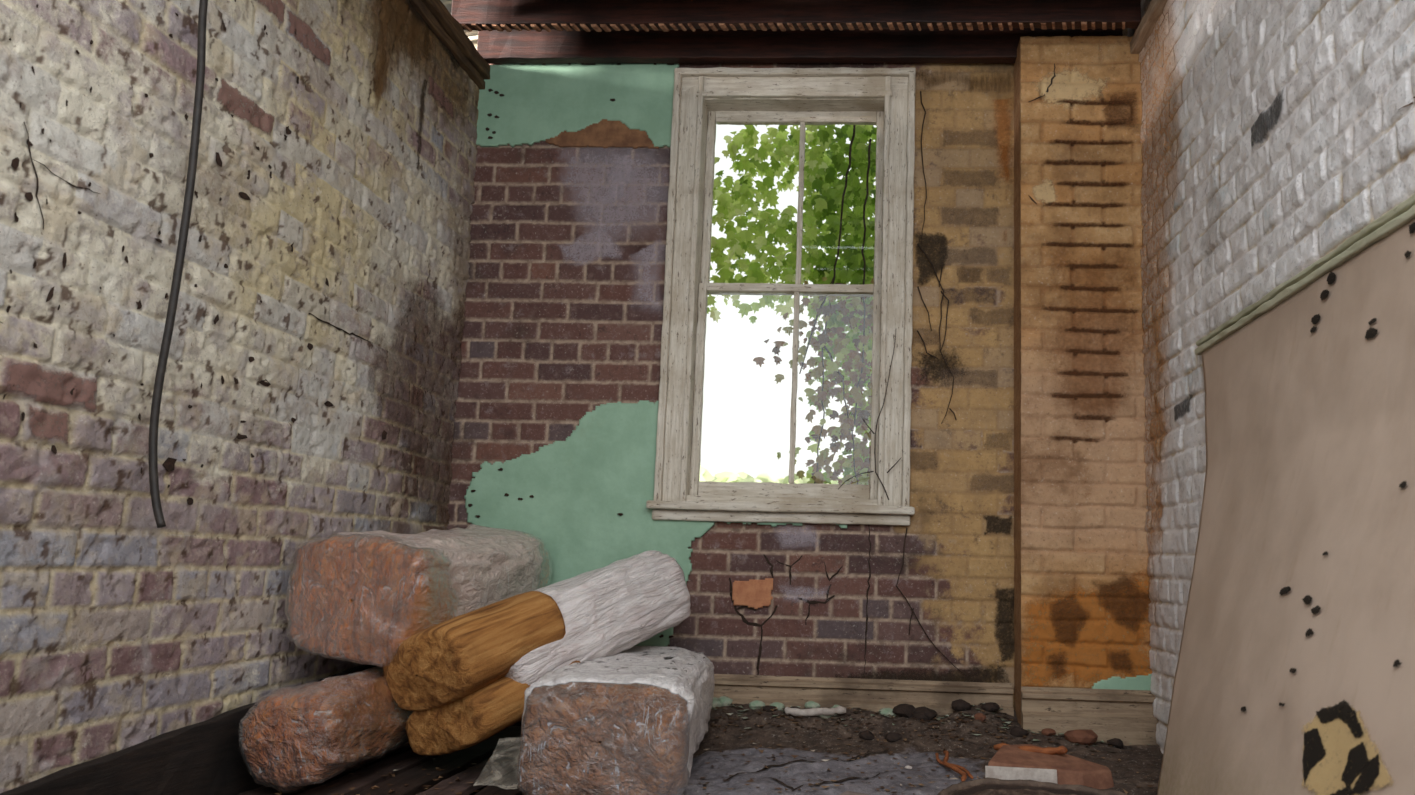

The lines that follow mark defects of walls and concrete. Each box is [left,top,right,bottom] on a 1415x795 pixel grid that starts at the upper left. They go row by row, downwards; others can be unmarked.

damp [373,0,459,102]
damp [417,79,427,169]
peeling [476,63,679,149]
peeling [464,400,803,586]
peeling [635,621,683,646]
spalling [732,578,773,609]
crack [729,525,871,679]